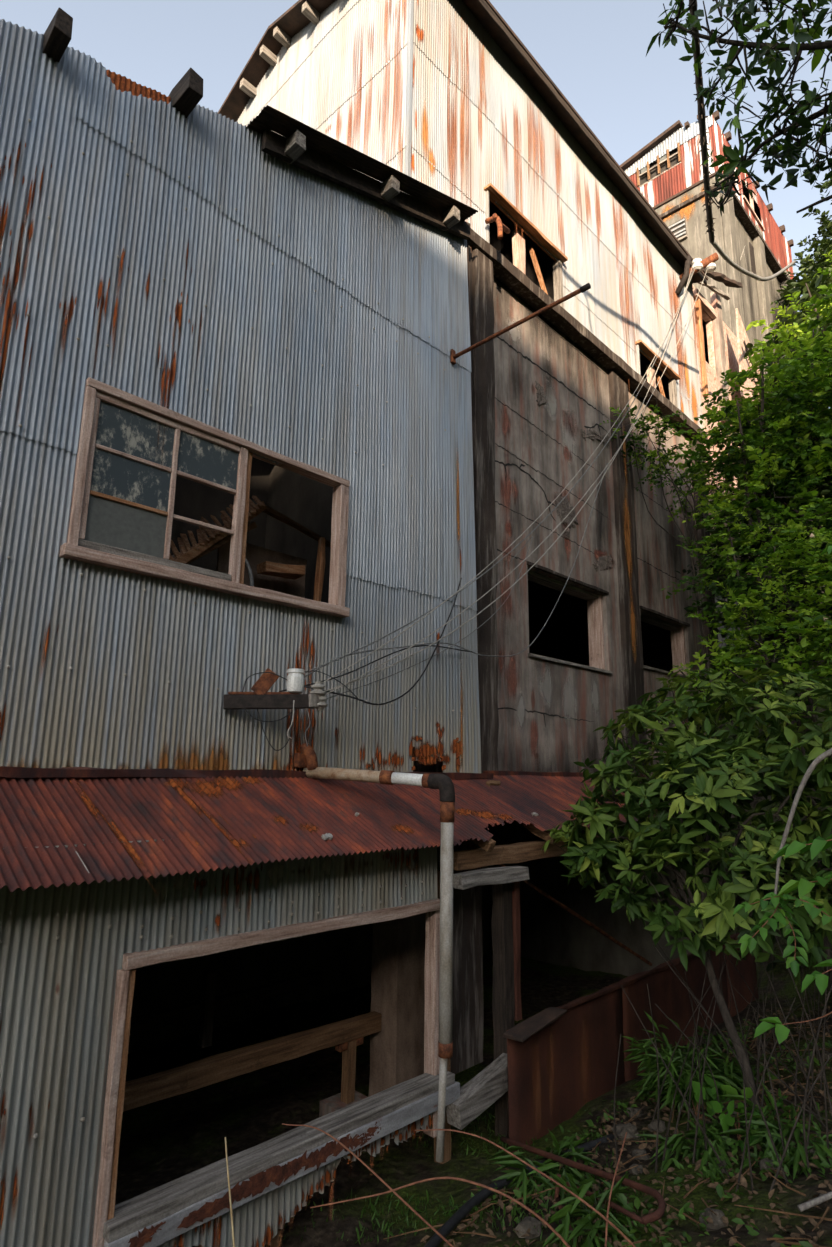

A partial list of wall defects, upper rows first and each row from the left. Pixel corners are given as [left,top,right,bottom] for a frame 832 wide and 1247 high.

rust [326,0,435,182]
rust [447,27,486,203]
rust [0,142,52,404]
rust [59,295,77,348]
rust [94,251,129,370]
rust [157,241,202,408]
leakage [509,302,597,379]
rust [287,621,317,694]
leakage [517,670,574,772]
rust [146,708,323,931]
rust [0,1168,17,1226]
rust [128,1113,433,1247]